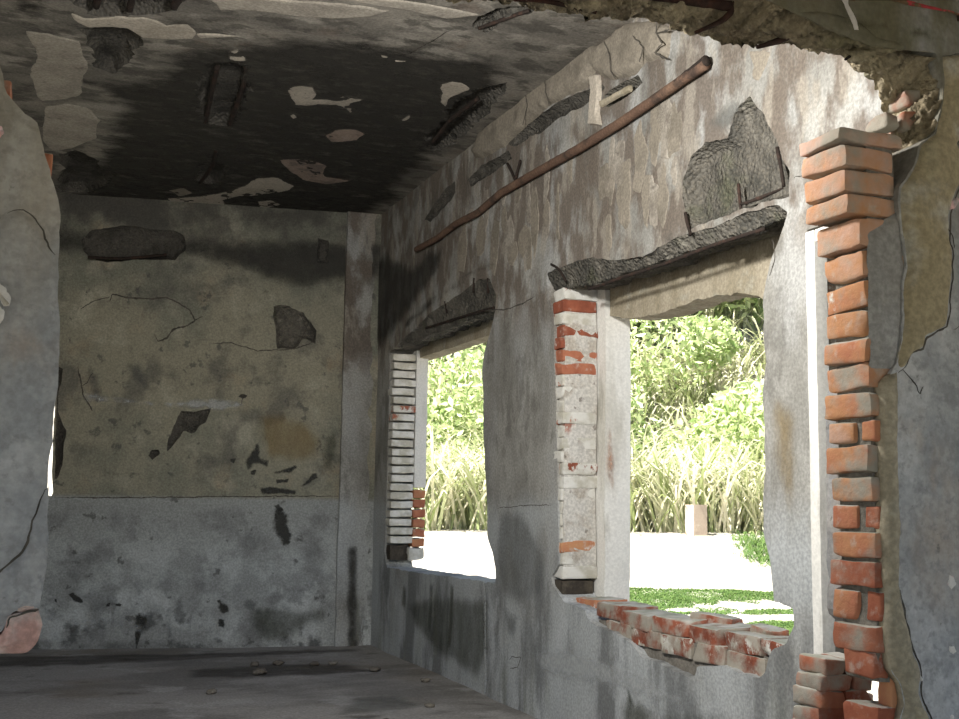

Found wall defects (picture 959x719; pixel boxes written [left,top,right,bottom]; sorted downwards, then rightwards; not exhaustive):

spalling [211,0,932,79]
peeling [26,0,241,194]
peeling [288,86,361,119]
crack [8,209,54,254]
spalling [82,225,186,263]
peeling [168,159,348,207]
spalling [547,96,790,291]
flaking render [0,210,66,495]
flaking render [148,408,211,460]
flaking render [0,512,48,628]
crack [0,488,338,573]
crack [6,609,39,628]